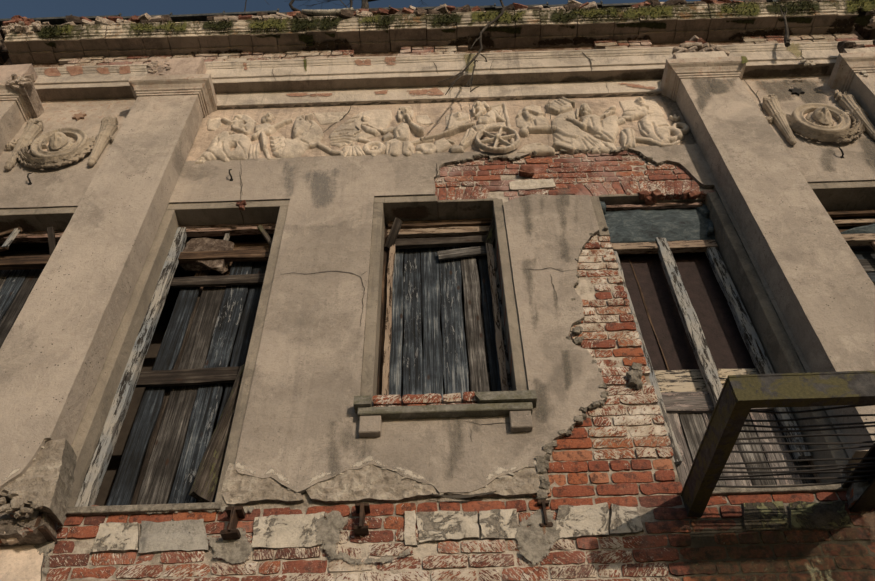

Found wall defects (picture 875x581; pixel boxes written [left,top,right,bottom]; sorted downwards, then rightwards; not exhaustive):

water stain [185,50,247,70]
water stain [533,36,606,46]
water stain [826,17,856,34]
flaking render [434,148,715,205]
crack [285,271,367,326]
flaking render [221,226,682,507]
spalling [0,439,77,546]